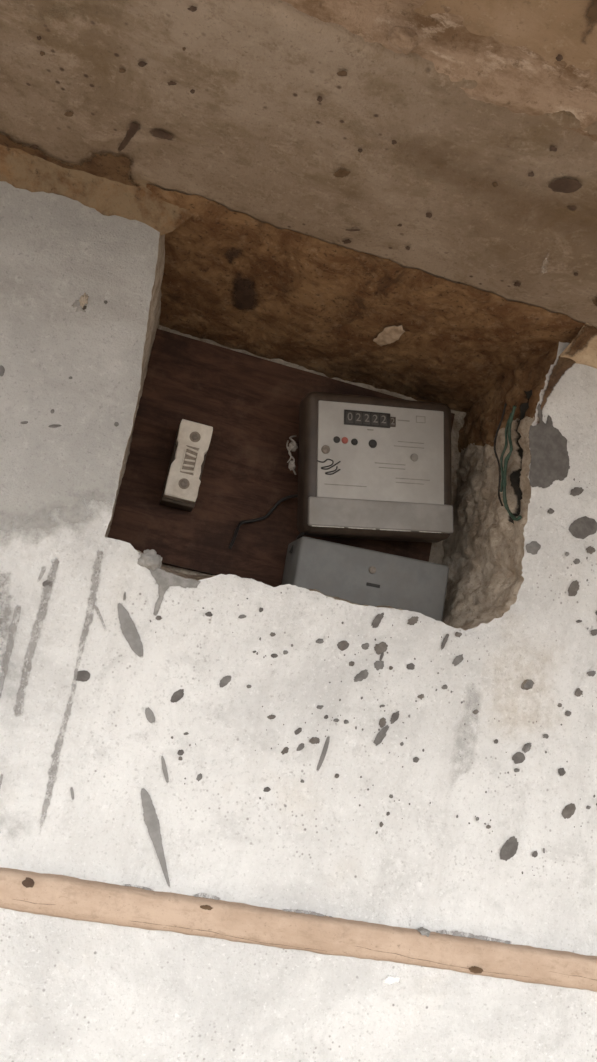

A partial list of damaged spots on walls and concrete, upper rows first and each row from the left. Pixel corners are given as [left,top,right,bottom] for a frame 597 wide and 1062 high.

damp [582,0,597,42]
peeling [373,325,405,346]
damp [529,404,590,499]
damp [565,516,597,596]
damp [0,593,21,696]
damp [14,558,59,715]
damp [118,592,143,657]
damp [42,552,106,819]
damp [145,707,155,723]